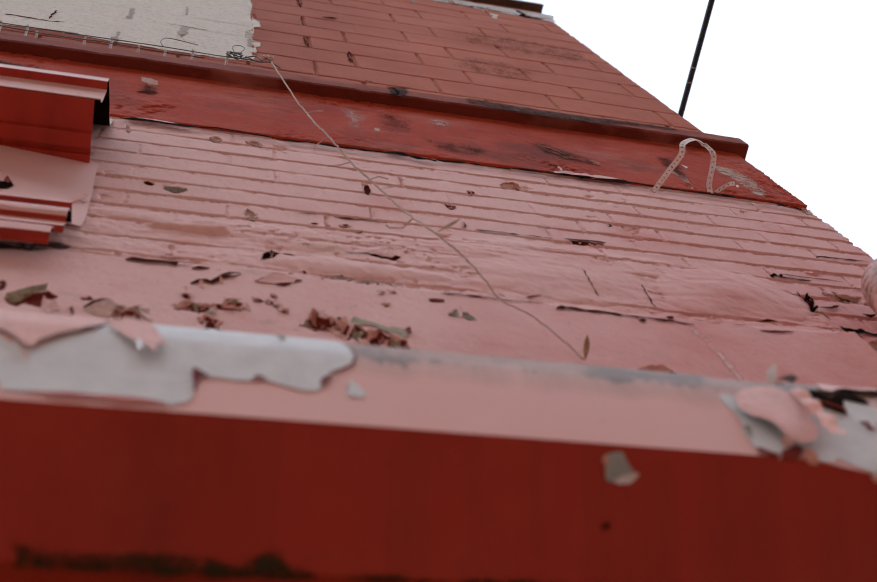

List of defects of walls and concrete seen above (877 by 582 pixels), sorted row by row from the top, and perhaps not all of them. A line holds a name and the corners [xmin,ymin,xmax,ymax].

peeling [0,266,412,405]
peeling [602,452,639,484]
peeling [718,364,877,483]
damp [14,546,316,580]